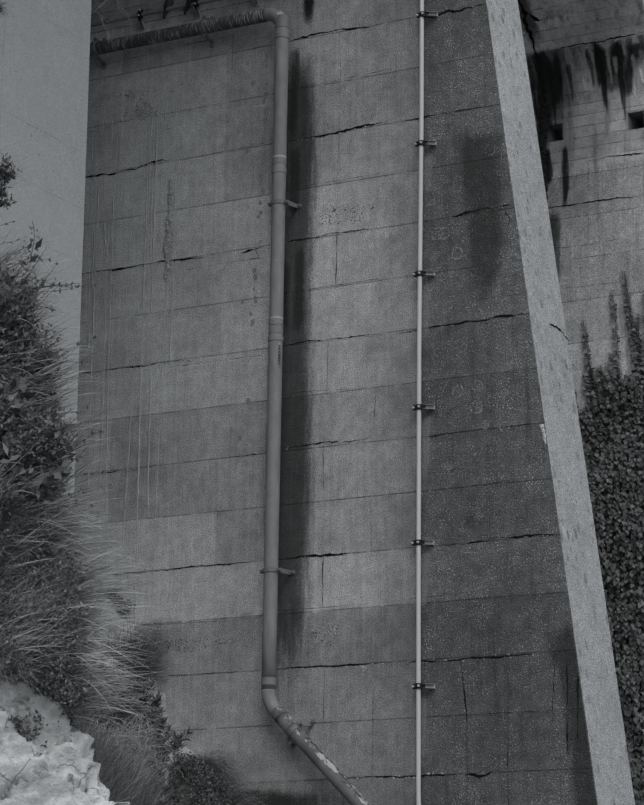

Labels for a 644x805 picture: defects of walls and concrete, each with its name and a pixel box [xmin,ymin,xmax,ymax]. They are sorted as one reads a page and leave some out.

crack [289,26,376,42]
water stain [582,35,644,116]
crack [306,106,496,140]
water stain [528,52,573,205]
crack [86,159,174,179]
crack [402,313,522,334]
crack [82,359,194,375]
crack [282,653,579,750]
crack [348,752,509,805]